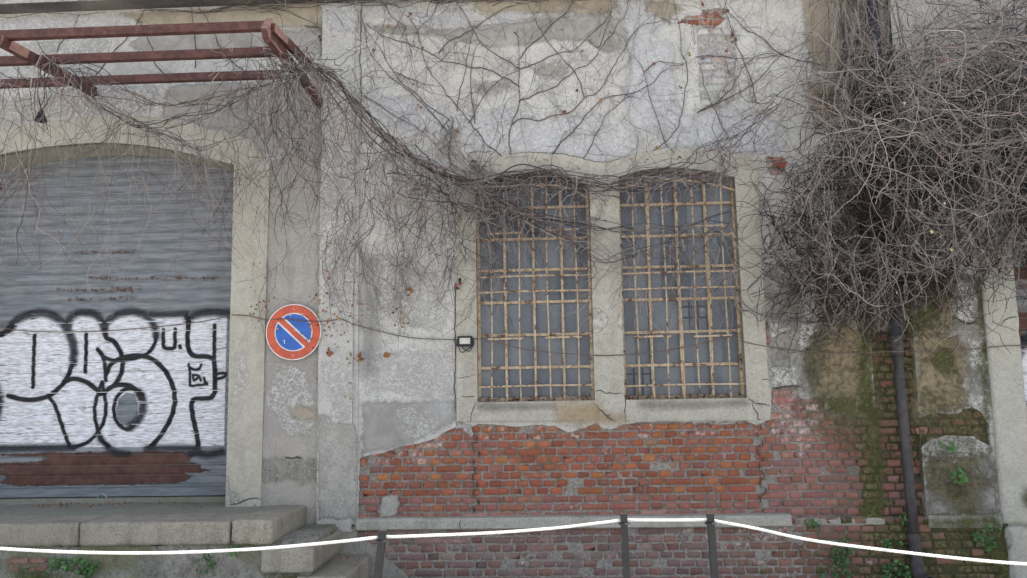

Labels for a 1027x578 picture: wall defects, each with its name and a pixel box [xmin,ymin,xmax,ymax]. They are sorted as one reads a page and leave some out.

flaking render [0,2,357,76]
flaking render [0,82,322,155]
flaking render [364,0,788,175]
flaking render [375,254,449,331]
leakage [911,254,988,420]
flaking render [262,293,885,518]
corrosion [0,450,210,487]